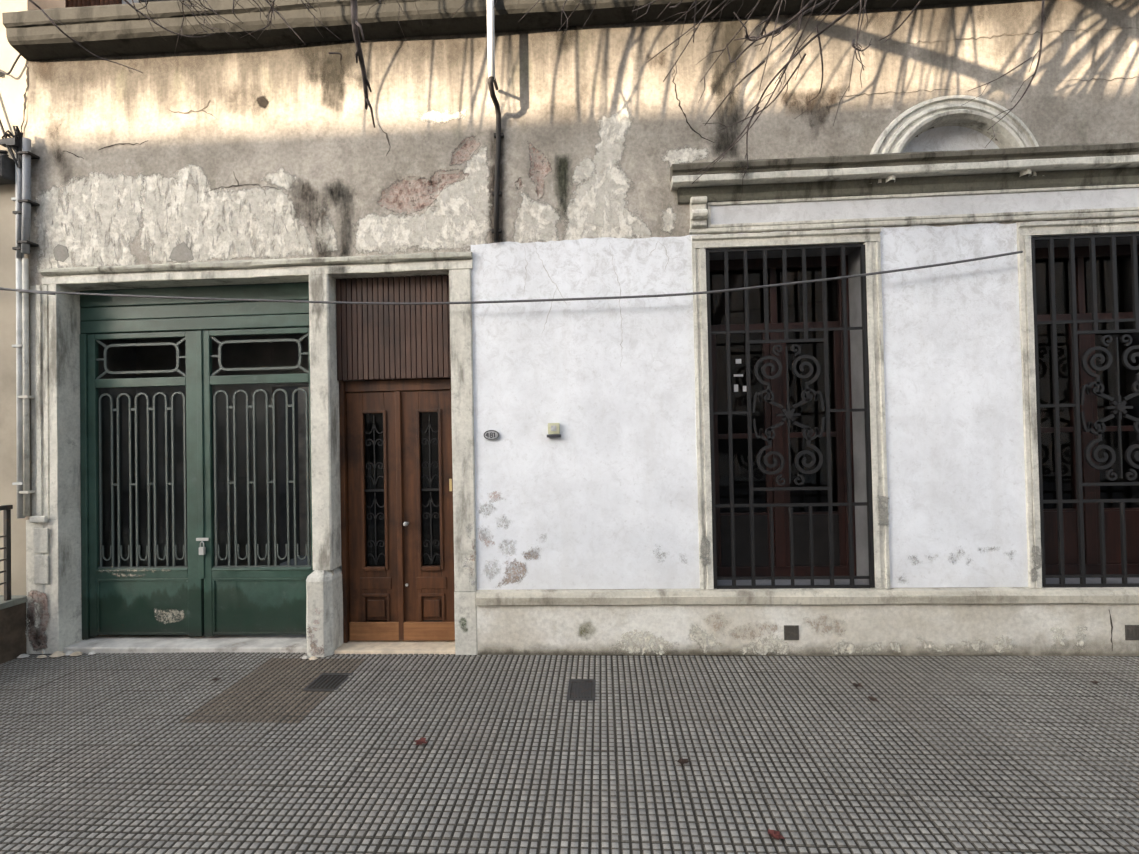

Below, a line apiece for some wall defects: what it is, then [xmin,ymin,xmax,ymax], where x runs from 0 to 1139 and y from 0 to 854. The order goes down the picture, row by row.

water stain [299,40,356,107]
crack [67,141,146,159]
peeling [33,165,338,273]
crack [169,100,216,118]
water stain [294,183,350,273]
peeling [353,137,493,254]
peeling [420,109,466,124]
peeling [514,103,676,243]
peeling [661,147,708,168]
water stain [677,17,1139,204]
peeling [470,531,538,586]
flaking render [26,590,50,650]